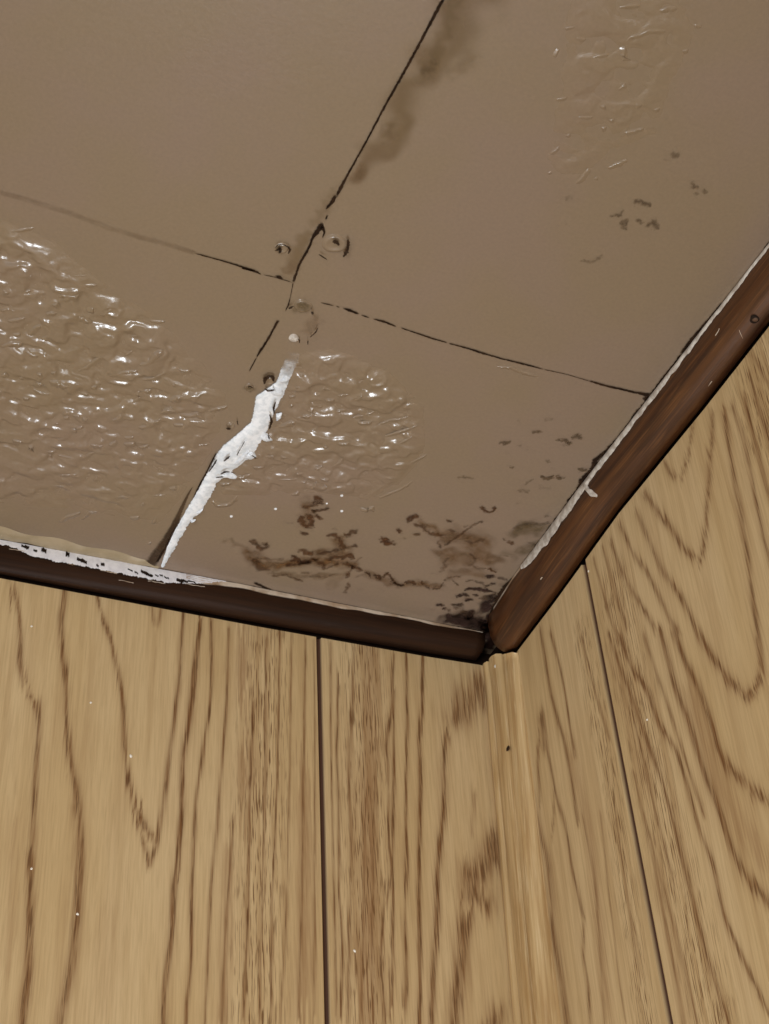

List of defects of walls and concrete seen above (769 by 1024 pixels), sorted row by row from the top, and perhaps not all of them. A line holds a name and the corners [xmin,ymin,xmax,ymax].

peeling [0,369,483,633]
damp [297,496,329,535]
damp [245,530,437,588]
damp [380,507,497,653]